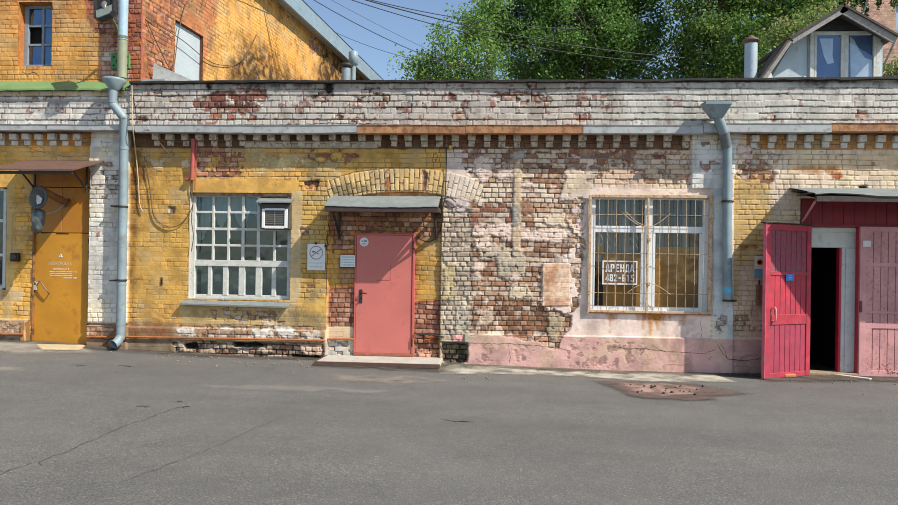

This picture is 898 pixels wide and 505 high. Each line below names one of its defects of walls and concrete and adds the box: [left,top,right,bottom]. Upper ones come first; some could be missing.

peeling [94,0,194,79]
leakage [231,46,344,94]
peeling [193,87,267,122]
peeling [180,146,245,179]
peeling [737,145,780,184]
peeling [332,147,720,364]
spalling [174,287,354,358]
crack [610,322,761,365]
spalling [715,315,751,331]